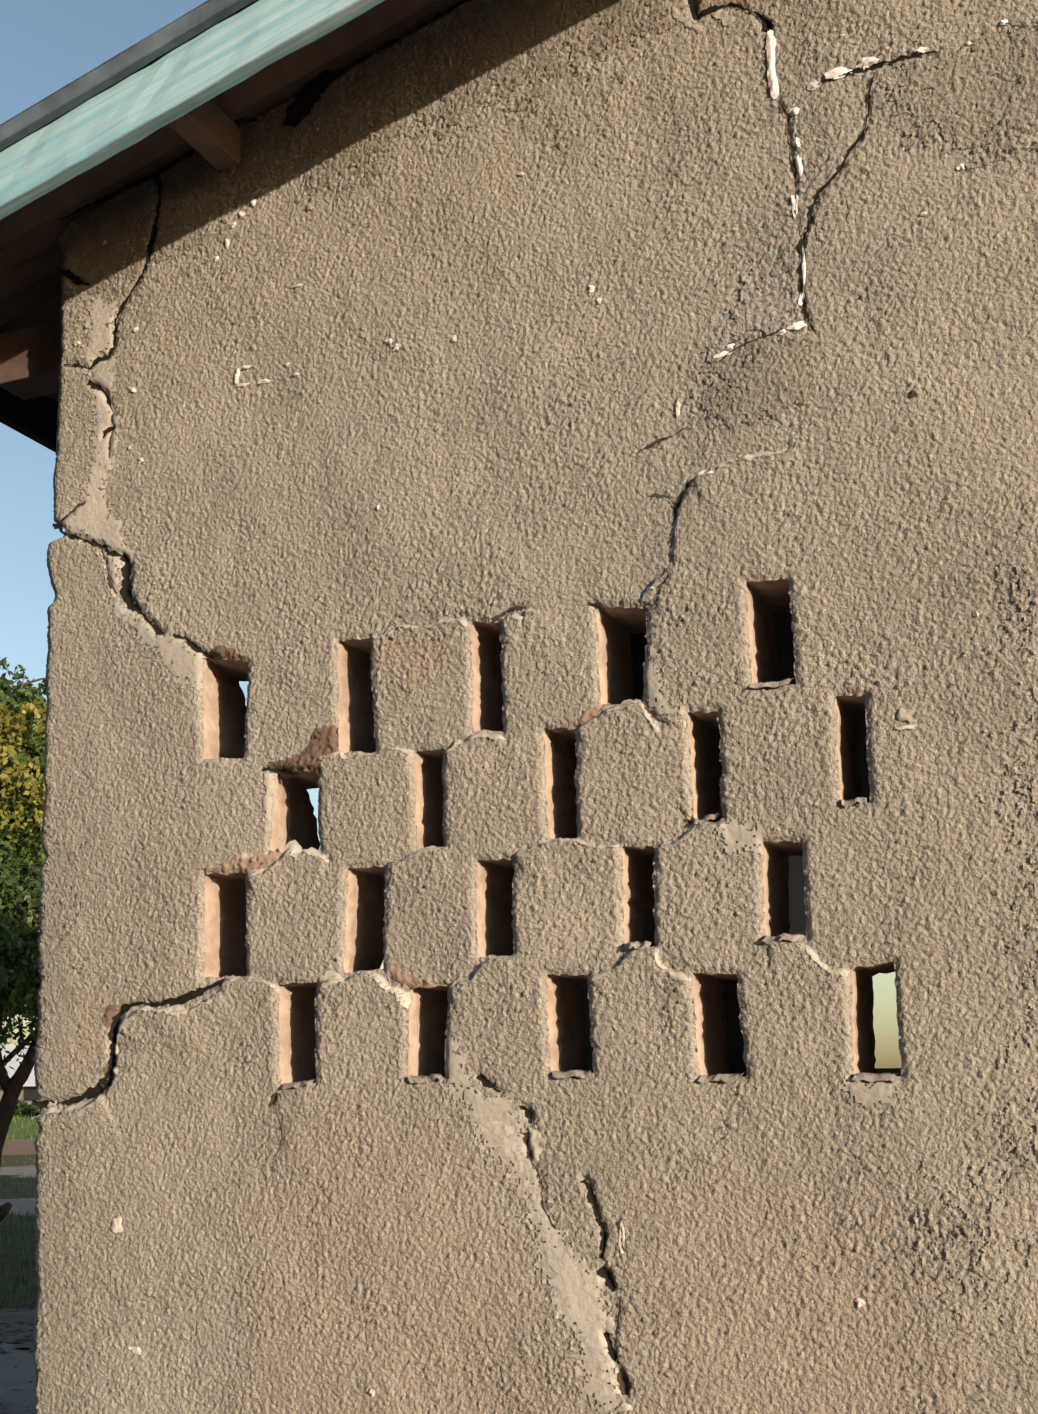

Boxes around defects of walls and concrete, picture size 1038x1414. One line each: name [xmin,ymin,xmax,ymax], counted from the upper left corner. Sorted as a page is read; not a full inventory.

crack [689,0,773,31]
crack [720,51,938,362]
crack [56,149,195,458]
crack [638,427,685,453]
crack [52,501,218,664]
crack [493,606,525,621]
crack [263,766,299,779]
crack [644,702,670,723]
crack [31,979,224,1109]
crack [477,1073,556,1229]
crack [581,1179,629,1414]